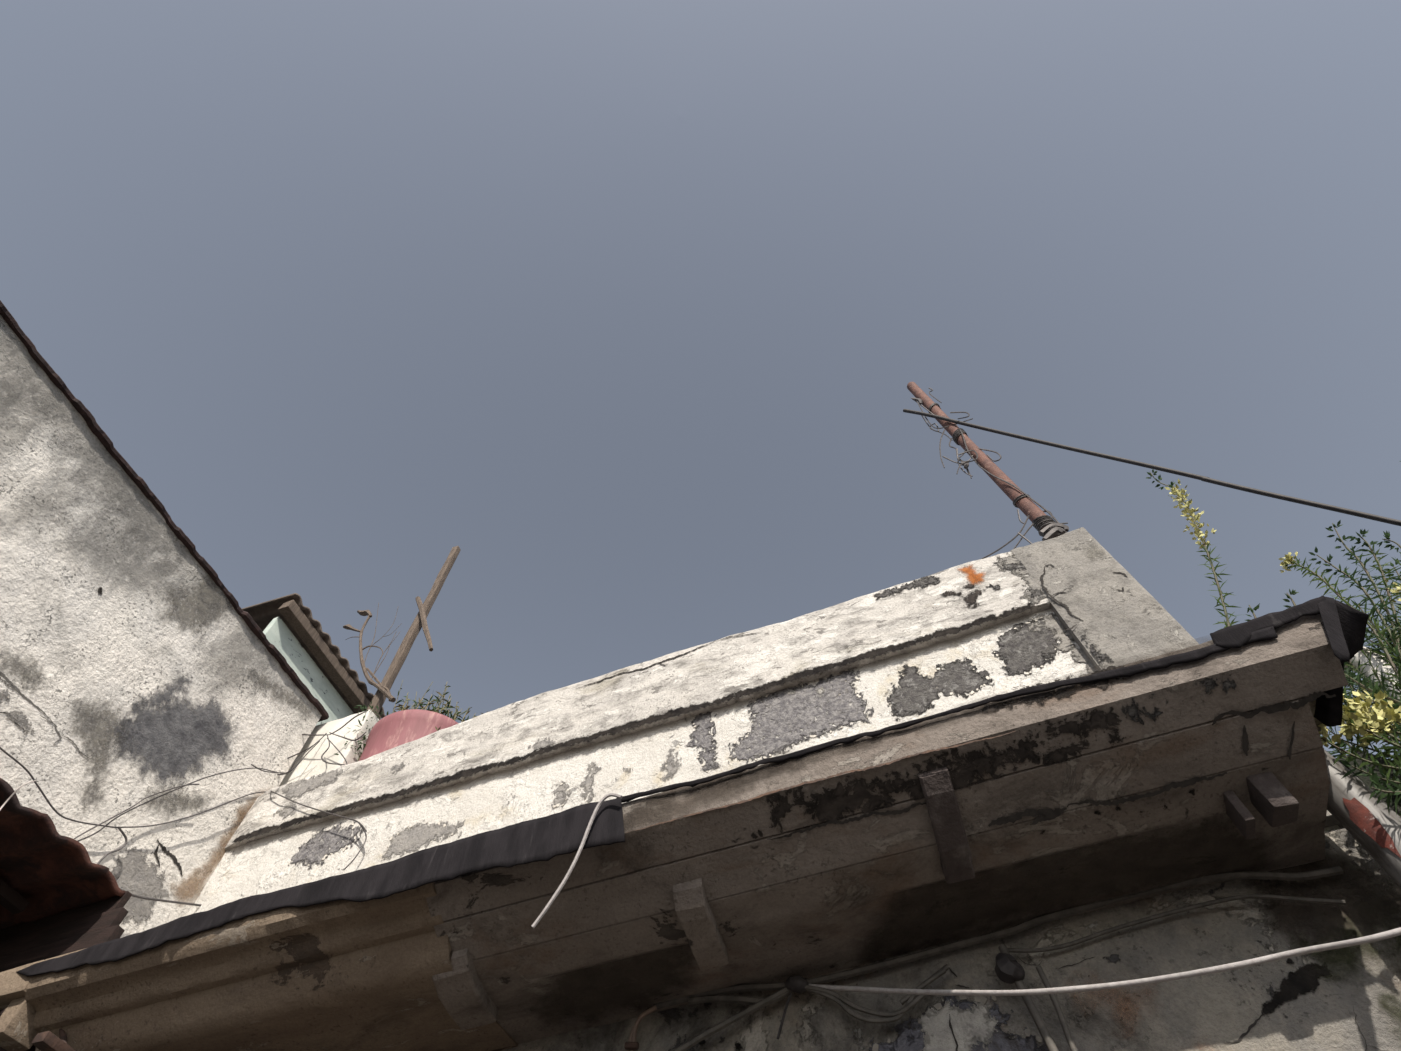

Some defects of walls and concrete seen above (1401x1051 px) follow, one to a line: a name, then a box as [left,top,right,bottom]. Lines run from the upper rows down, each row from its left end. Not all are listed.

rust [960,565,983,583]
peeling [1081,635,1114,663]
crack [0,671,91,759]
peeling [659,618,1061,781]
peeling [1195,675,1237,696]
damp [73,678,232,813]
peeling [751,694,1168,839]
peeling [288,822,366,870]
peeling [111,846,170,925]
peeling [869,996,1048,1051]
crack [1227,1015,1263,1043]